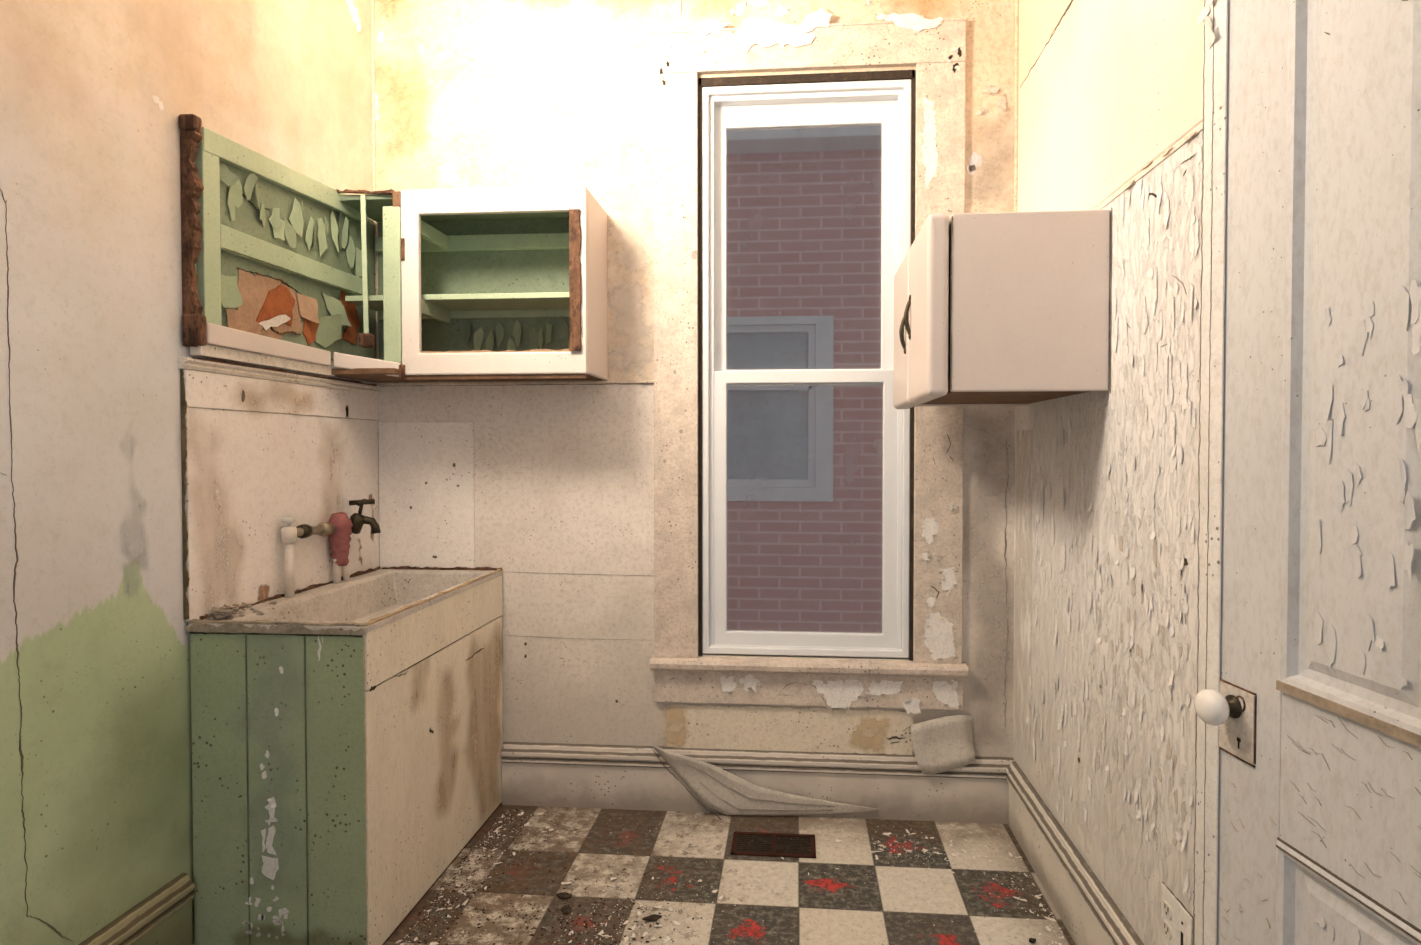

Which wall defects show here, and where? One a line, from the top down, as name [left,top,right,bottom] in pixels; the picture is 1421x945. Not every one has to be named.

peeling [684,0,832,56]
peeling [860,0,943,33]
crack [1020,0,1073,88]
peeling [237,269,319,346]
peeling [339,290,360,344]
peeling [1399,280,1421,355]
peeling [1386,375,1421,589]
crack [0,189,72,941]
peeling [920,502,959,660]
peeling [1025,257,1197,857]
peeling [807,678,962,744]
peeling [243,796,289,939]